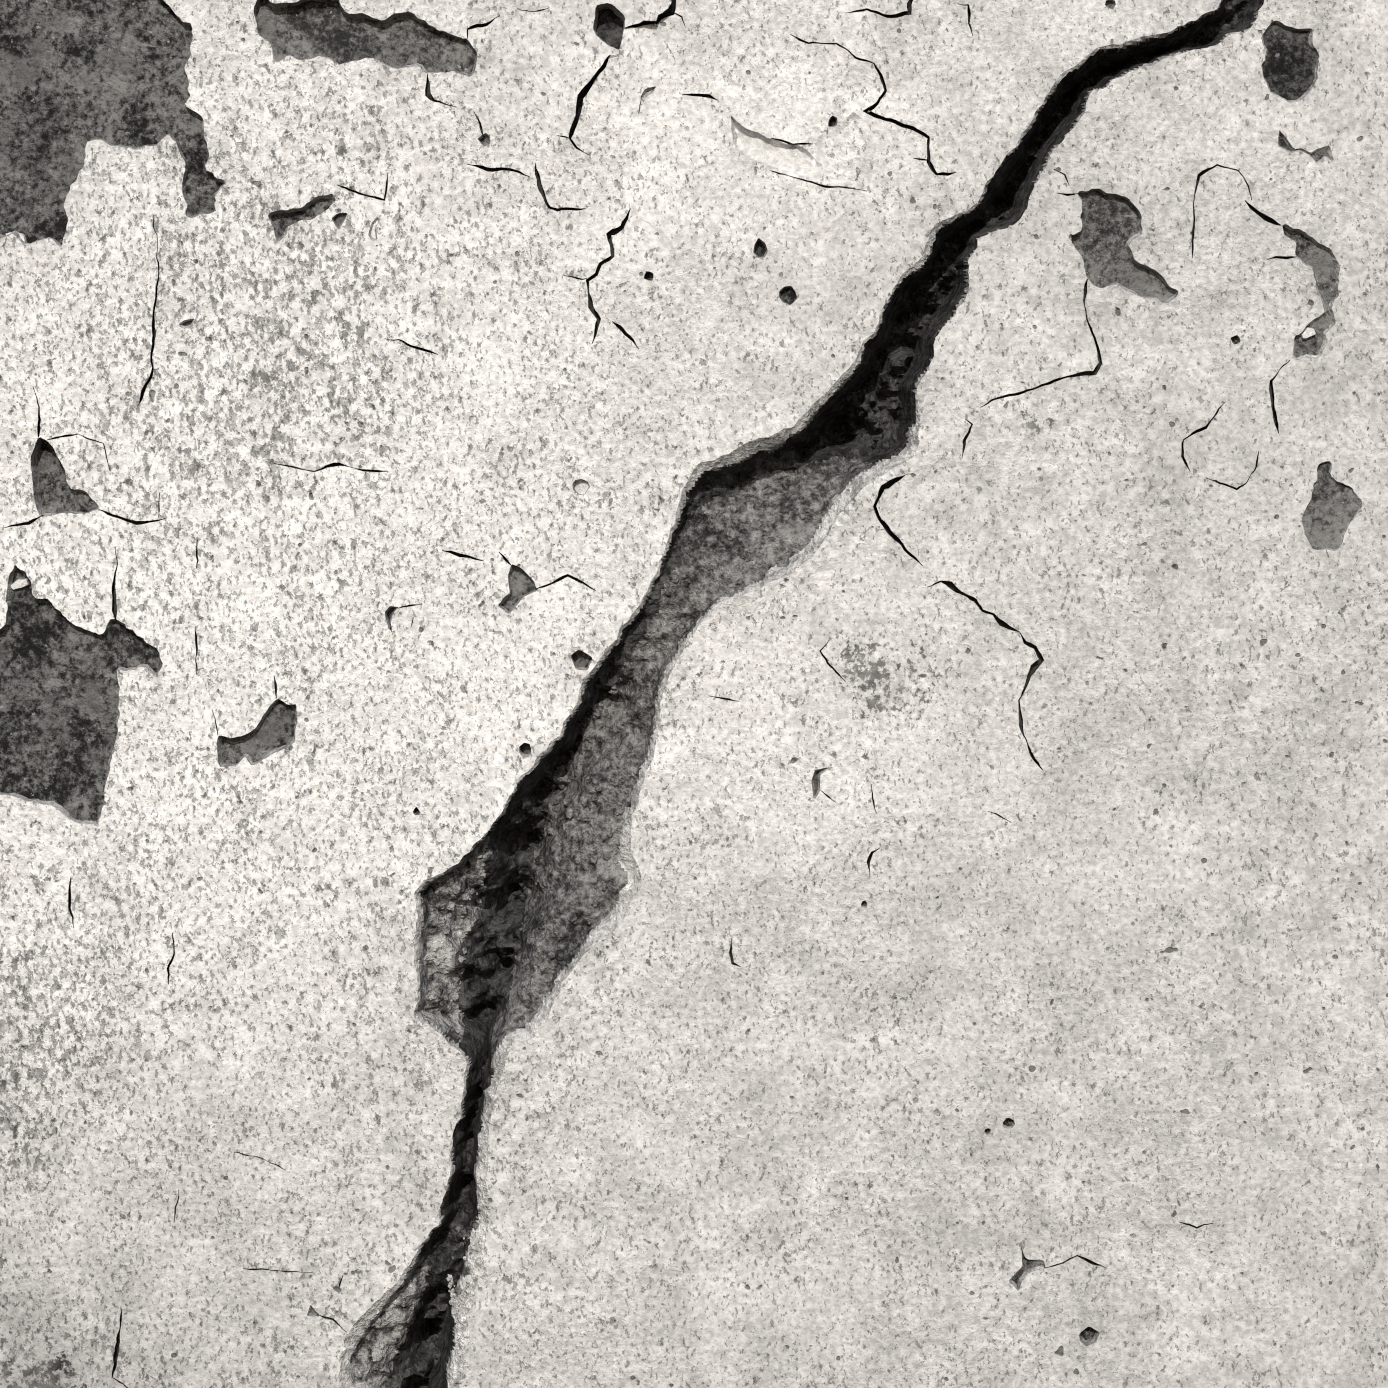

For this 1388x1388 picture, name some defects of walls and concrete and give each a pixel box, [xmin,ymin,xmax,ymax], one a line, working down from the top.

flaking render [0,0,225,247]
flaking render [254,0,500,108]
spalling [1261,21,1319,103]
flaking render [981,169,1178,407]
flaking render [1191,164,1340,434]
spalling [2,387,167,529]
crack [273,463,388,472]
spalling [1302,461,1362,551]
flaking render [0,546,163,826]
spalling [212,676,297,767]
crack [338,0,1264,1388]